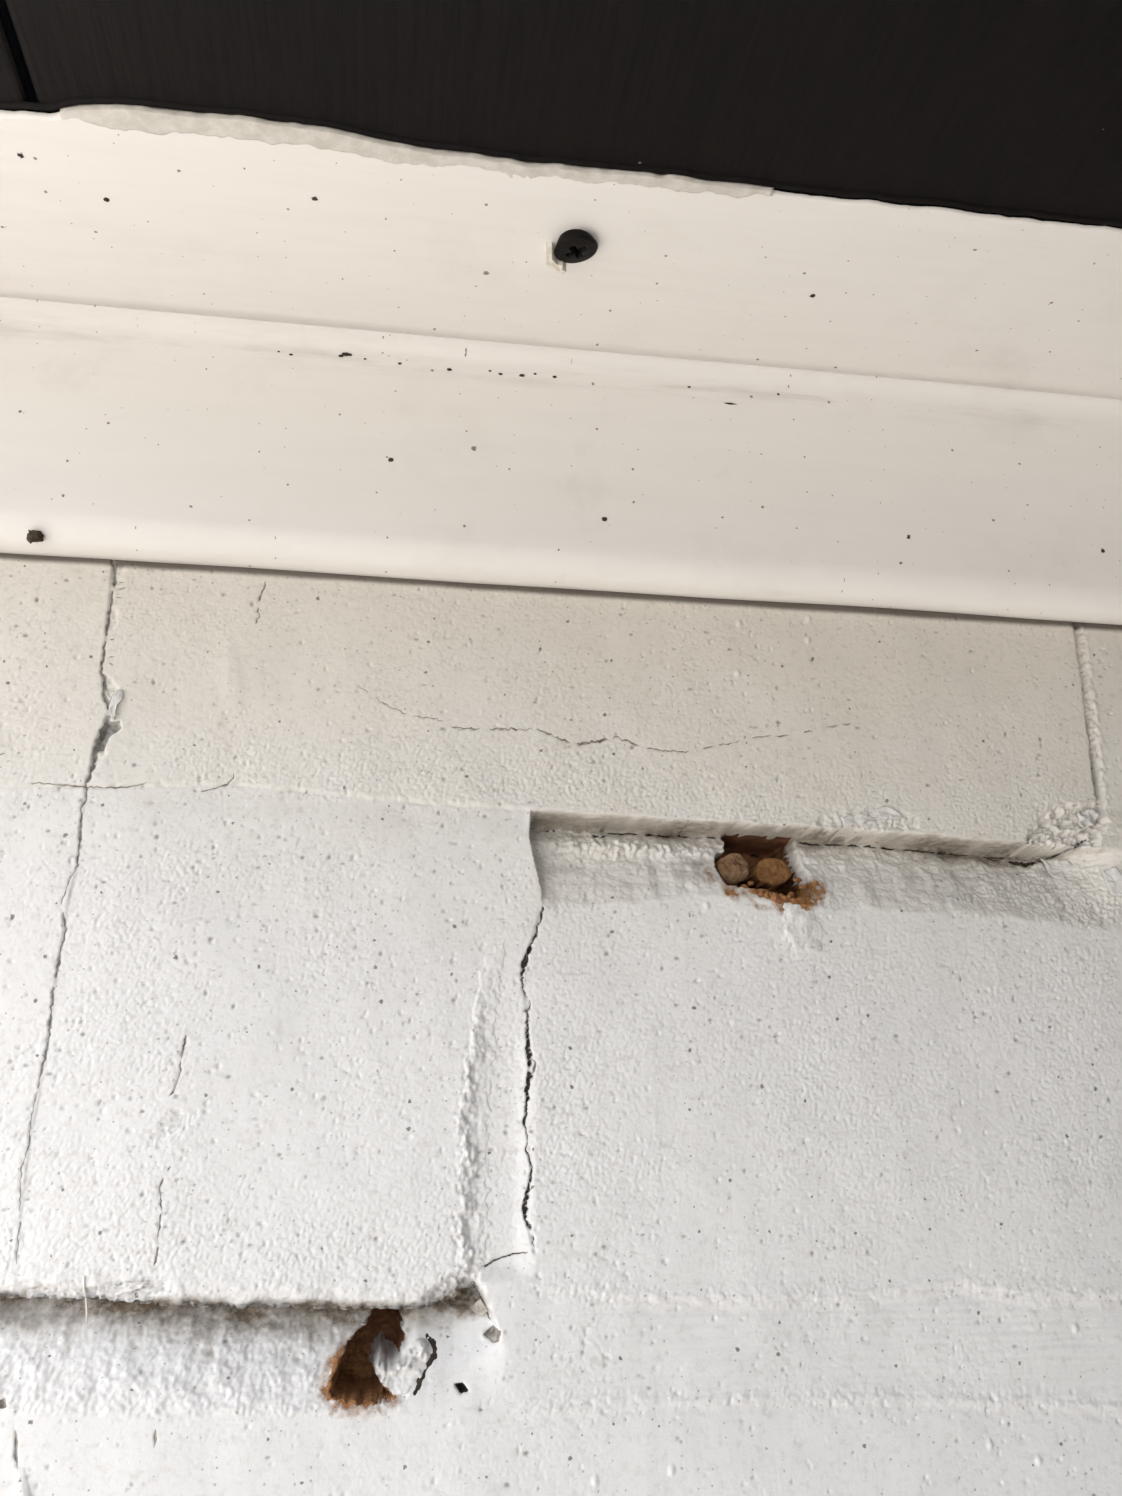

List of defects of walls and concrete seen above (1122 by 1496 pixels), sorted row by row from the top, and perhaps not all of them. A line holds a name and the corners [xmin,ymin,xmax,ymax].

crack [16,560,147,1264]
corrosion [777,881,826,912]
crack [472,907,544,1321]
spalling [422,1270,501,1343]
corrosion [327,1332,358,1368]
corrosion [320,1387,397,1410]
spalling [326,1339,396,1406]